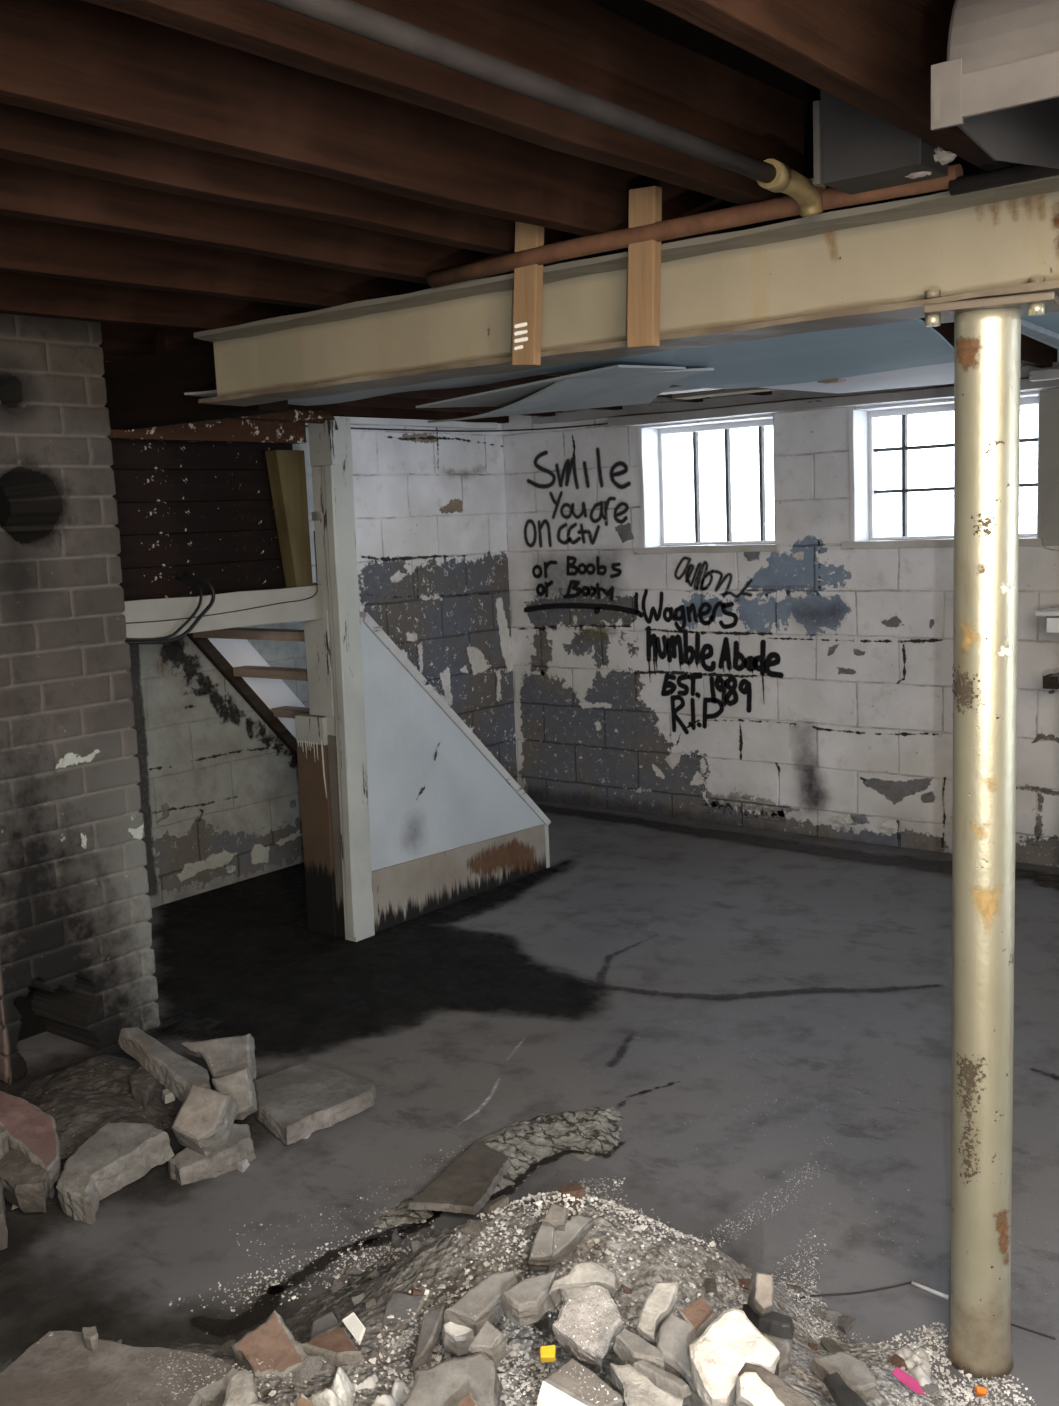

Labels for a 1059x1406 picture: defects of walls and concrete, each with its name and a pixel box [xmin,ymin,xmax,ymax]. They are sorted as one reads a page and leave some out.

peeling [358,535,949,852]
peeling [55,749,100,769]
peeling [127,800,303,895]
rust [467,837,537,876]
crack [551,943,940,1000]
crack [618,1082,674,1106]
rust [955,1052,987,1184]
crack [1031,1068,1059,1080]
crack [488,1142,624,1201]
rust [996,1210,1009,1264]
crack [191,1210,445,1337]